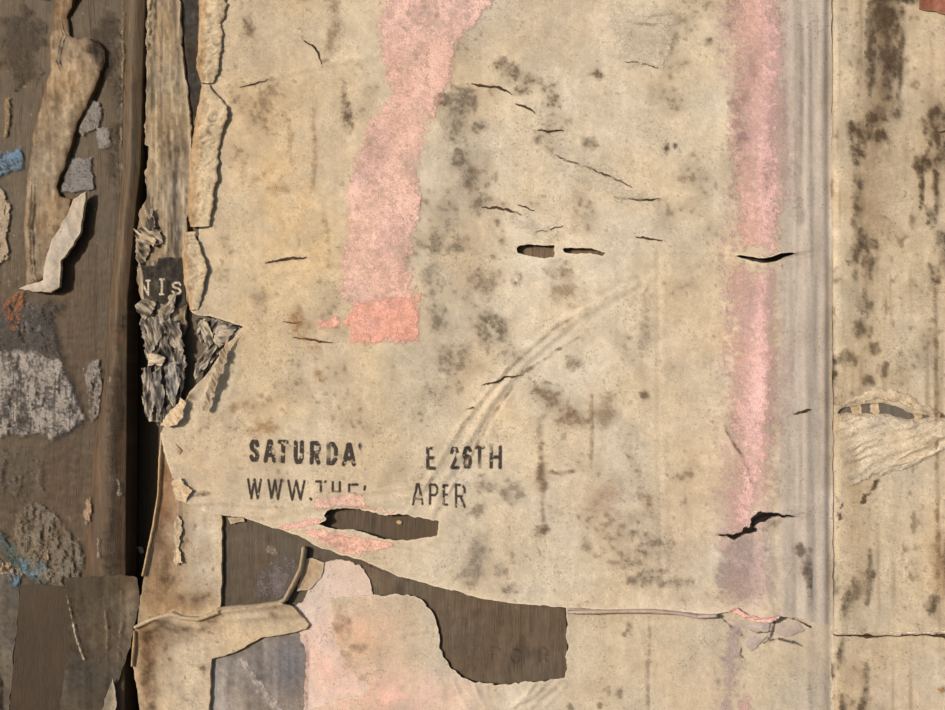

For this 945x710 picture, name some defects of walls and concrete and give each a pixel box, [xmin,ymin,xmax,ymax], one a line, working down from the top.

damp [849,0,913,164]
damp [846,203,876,277]
damp [913,107,945,251]
peeling [135,292,242,576]
damp [854,290,878,354]
damp [863,361,888,384]
peeling [131,515,718,684]